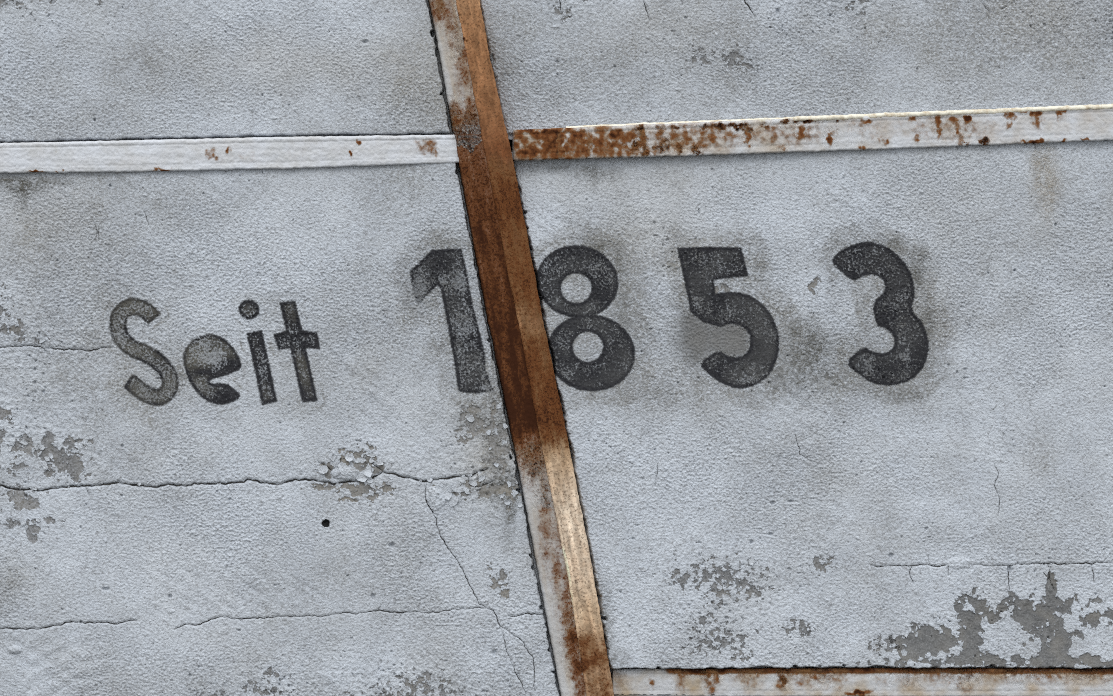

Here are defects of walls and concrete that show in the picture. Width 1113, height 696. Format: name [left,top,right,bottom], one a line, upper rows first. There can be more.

rust [935,115,990,146]
rust [1004,111,1044,144]
rust [419,140,437,156]
rust [429,0,816,696]
peeling [0,407,94,544]
peeling [301,442,396,506]
crack [0,462,545,687]
peeling [809,556,834,576]
peeling [772,618,816,638]
peeling [856,567,1113,668]
rust [666,667,1113,696]